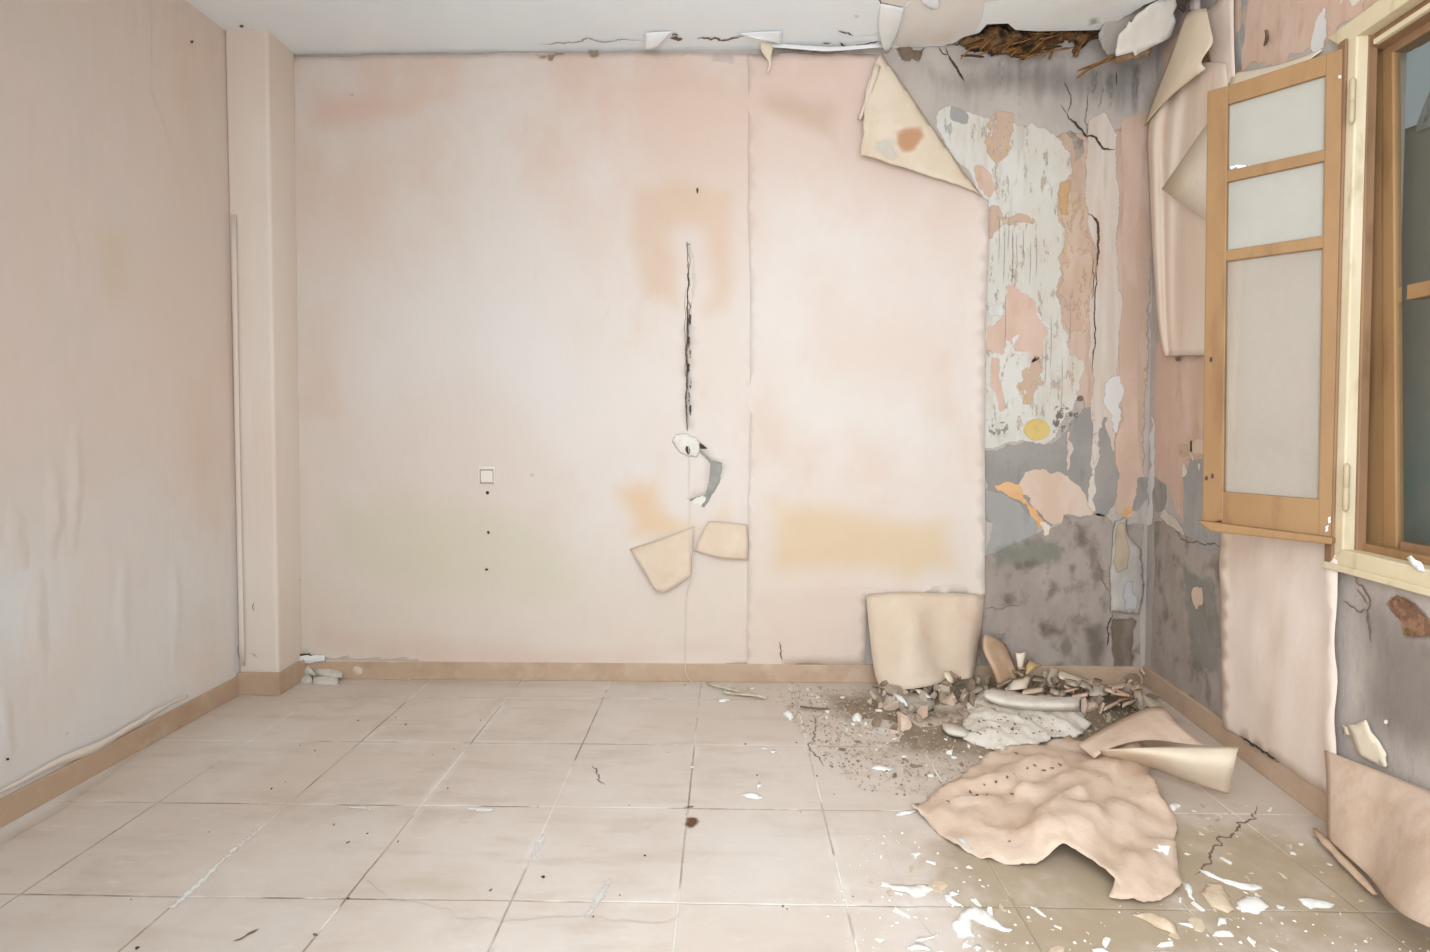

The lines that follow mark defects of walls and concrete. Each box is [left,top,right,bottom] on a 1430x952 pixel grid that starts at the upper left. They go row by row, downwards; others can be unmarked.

crack [546,31,879,54]
spalling [878,0,1116,79]
peeling [1176,0,1201,13]
leakage [609,163,750,328]
crack [683,242,691,430]
peeling [936,105,1098,449]
peeling [1114,110,1204,521]
peeling [1227,261,1243,484]
leakage [299,200,1222,718]
peeling [995,469,1094,536]
peeling [1191,587,1203,610]
crack [1195,806,1257,876]